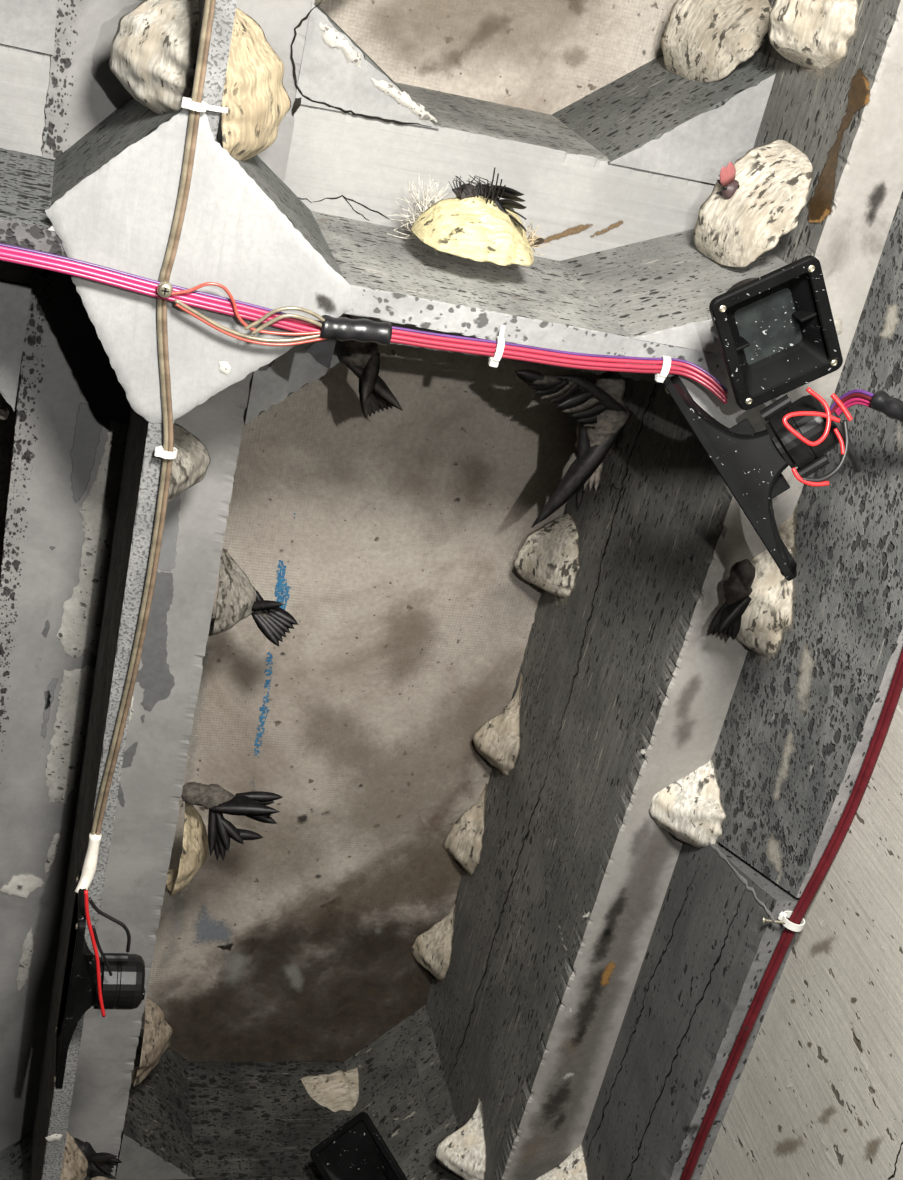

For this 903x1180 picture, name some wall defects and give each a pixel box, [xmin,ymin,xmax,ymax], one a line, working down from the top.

spalling [319,22,361,68]
crack [290,0,431,127]
spalling [371,78,438,123]
corrosion [808,69,870,223]
flaking render [41,403,128,803]
spalling [128,494,181,723]
damp [678,680,698,741]
flaking render [17,926,34,991]
damp [160,810,464,1062]
damp [516,824,673,1180]
corrosion [601,962,615,985]
crack [888,1142,903,1180]